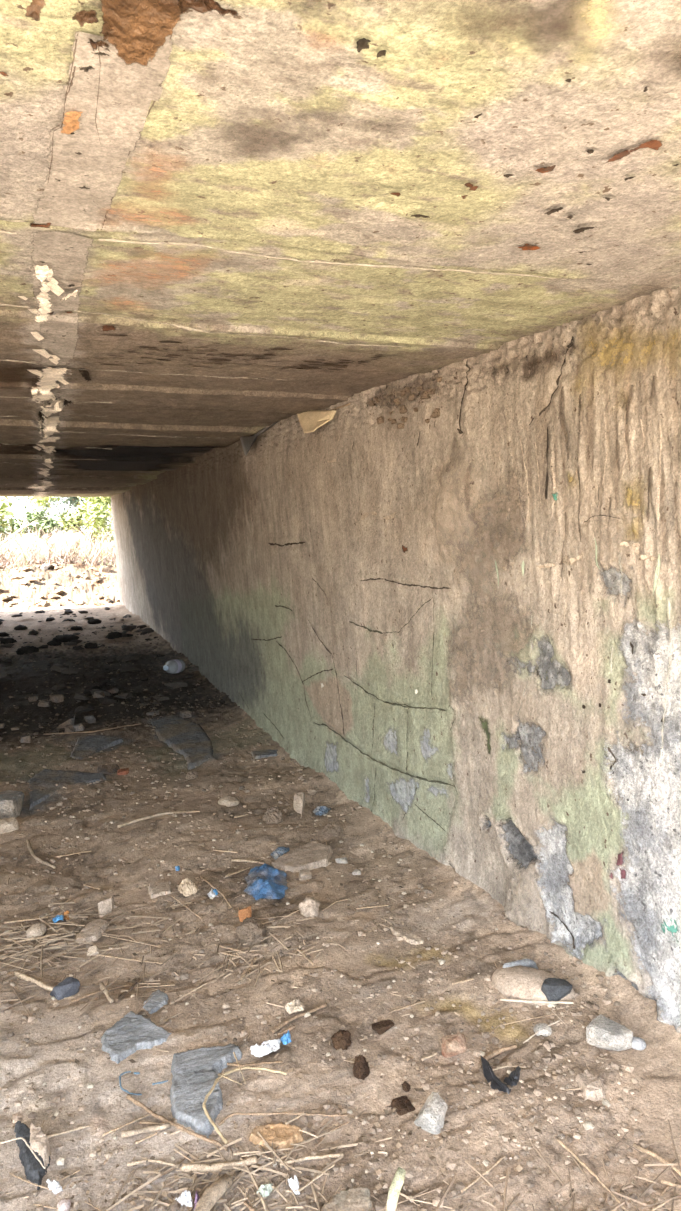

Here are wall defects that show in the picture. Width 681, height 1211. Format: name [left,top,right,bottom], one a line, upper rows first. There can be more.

corrosion [606,140,662,163]
crack [269,540,305,548]
crack [251,578,457,831]
spalling [502,720,546,773]
spalling [486,816,605,960]
spalling [604,618,681,1029]